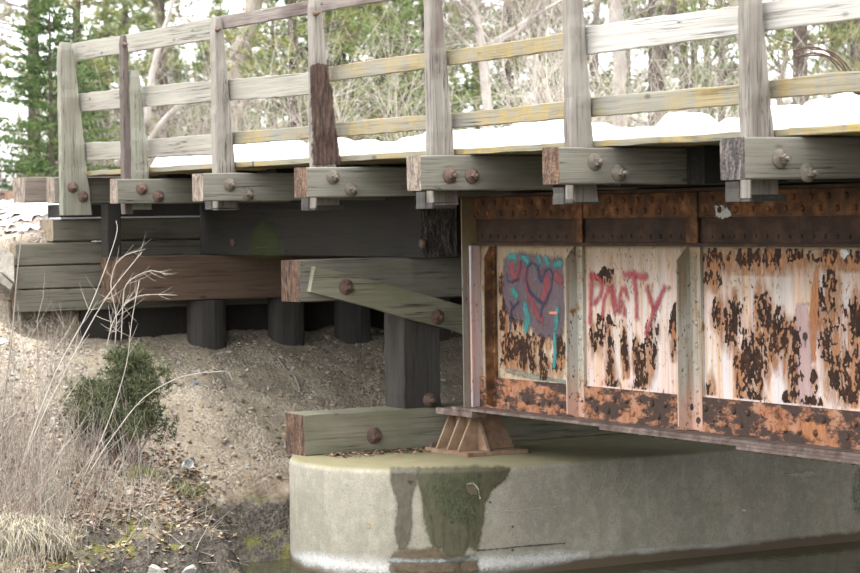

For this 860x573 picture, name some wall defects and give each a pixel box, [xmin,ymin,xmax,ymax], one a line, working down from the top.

corrosion [593,266,615,287]
corrosion [499,272,566,380]
corrosion [589,302,677,390]
corrosion [703,248,860,408]
corrosion [800,420,827,441]
water stain [390,467,419,550]